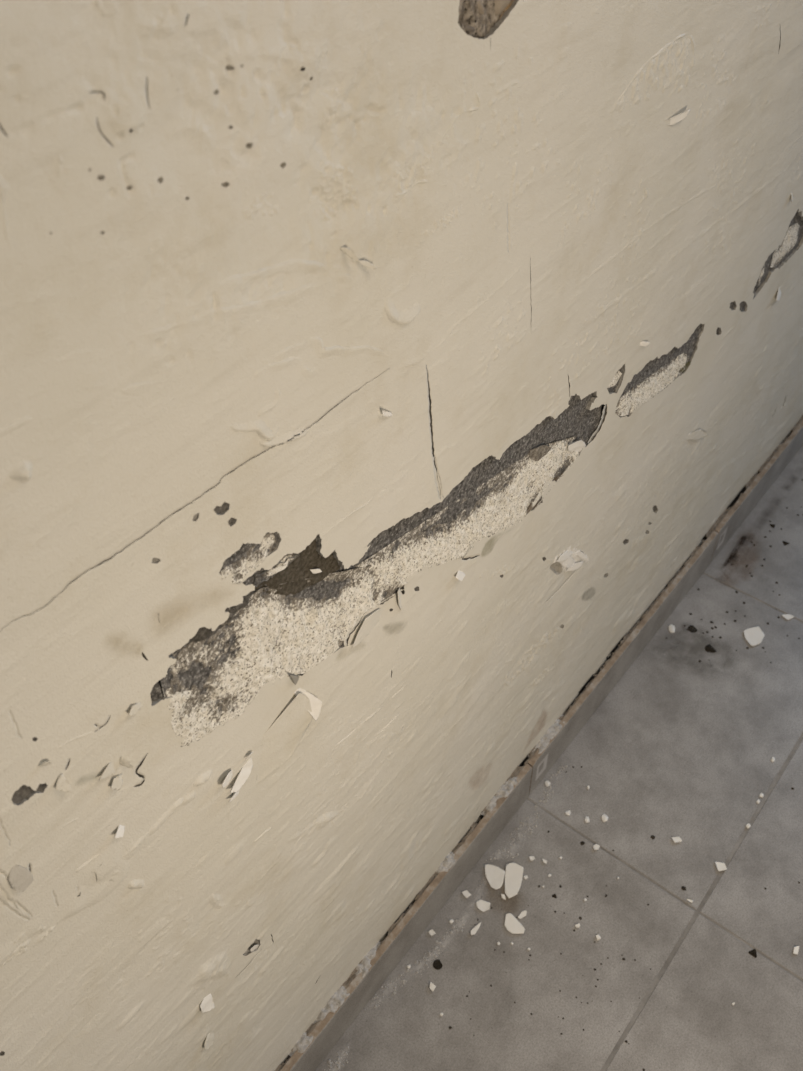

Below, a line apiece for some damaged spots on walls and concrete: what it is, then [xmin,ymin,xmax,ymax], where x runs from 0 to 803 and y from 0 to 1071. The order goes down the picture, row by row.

flaking render [458,0,519,39]
flaking render [730,209,803,312]
crack [0,368,390,632]
crack [426,365,444,500]
flaking render [150,323,722,747]